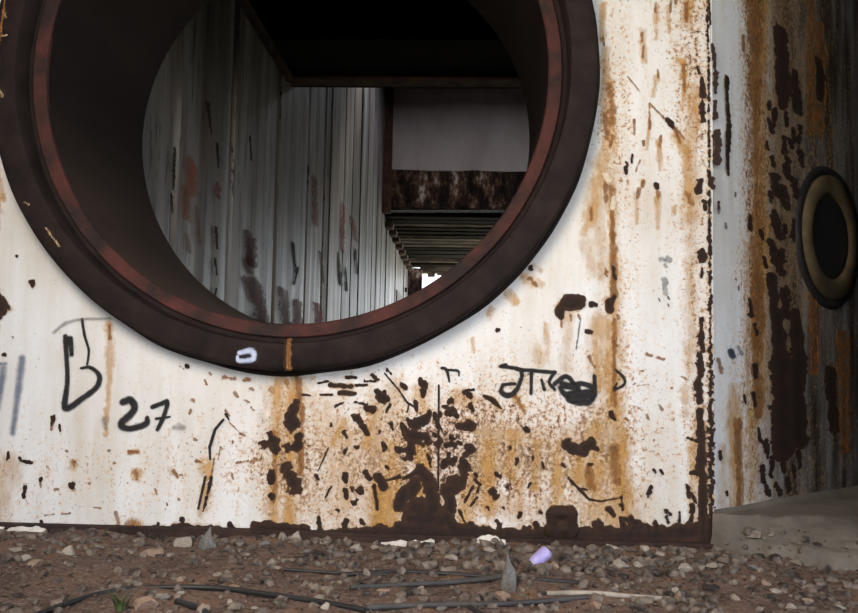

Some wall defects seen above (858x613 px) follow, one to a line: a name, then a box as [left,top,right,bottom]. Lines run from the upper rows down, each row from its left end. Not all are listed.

corrosion [669,0,692,23]
corrosion [603,60,617,149]
corrosion [633,104,662,154]
corrosion [673,129,695,217]
corrosion [677,58,699,126]
corrosion [585,153,661,421]
peeling [757,23,810,497]
corrosion [204,372,254,411]
corrosion [231,339,399,532]
corrosion [152,516,236,528]
corrosion [460,439,711,543]